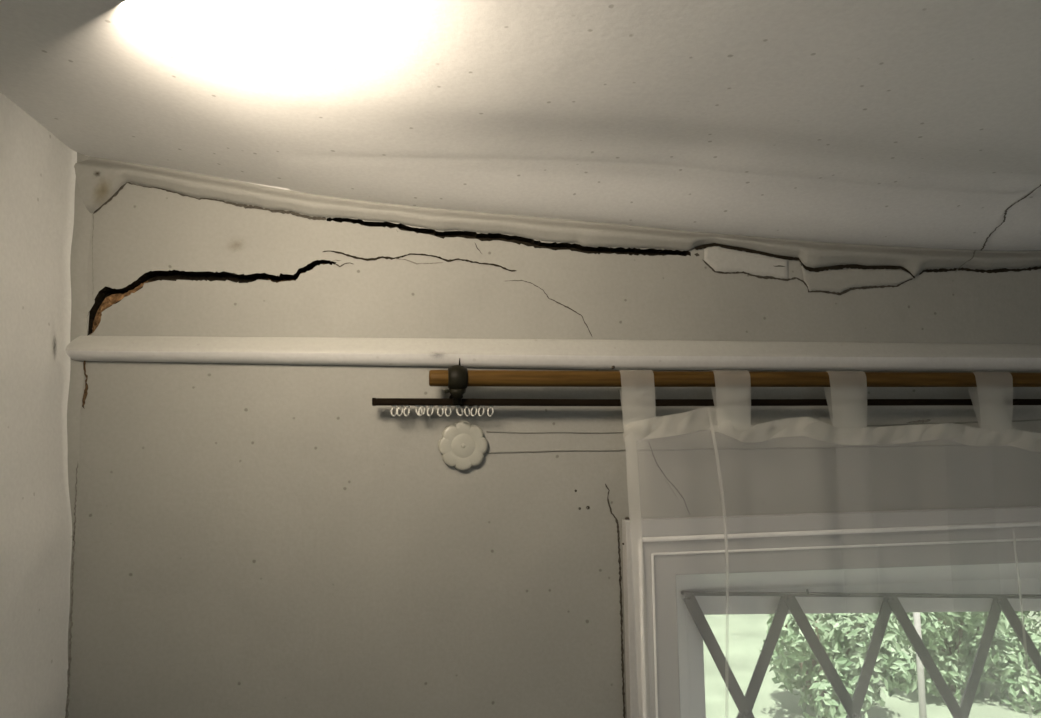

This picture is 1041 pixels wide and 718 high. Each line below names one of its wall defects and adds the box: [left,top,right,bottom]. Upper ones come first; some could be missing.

crack [87,182,1041,336]
crack [81,361,89,408]